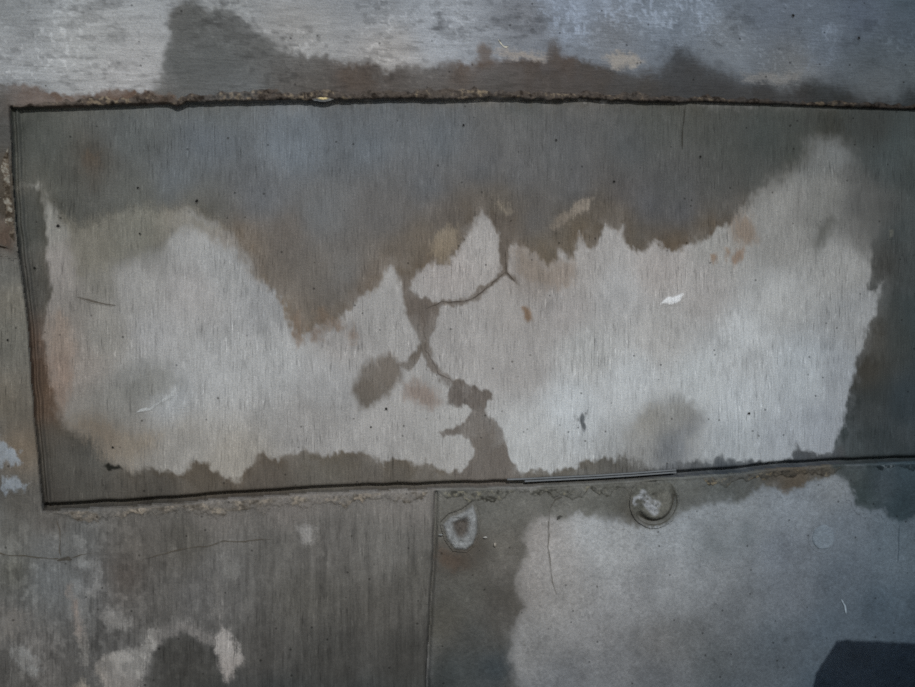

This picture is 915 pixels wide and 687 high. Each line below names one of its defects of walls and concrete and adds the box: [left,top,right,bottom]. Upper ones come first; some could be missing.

damp [0,638,51,682]
damp [13,180,553,687]
damp [0,0,915,538]